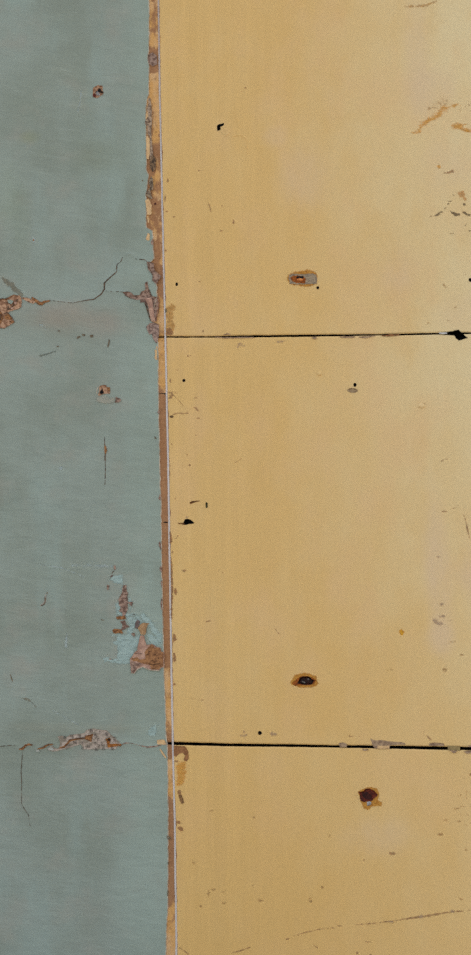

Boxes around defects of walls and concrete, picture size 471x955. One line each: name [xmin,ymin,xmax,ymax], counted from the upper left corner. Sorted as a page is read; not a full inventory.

crack [58,254,147,303]
corrosion [287,270,317,287]
peeling [0,294,50,328]
peeling [103,561,177,673]
corrosion [290,673,318,688]
corrosion [358,787,382,810]